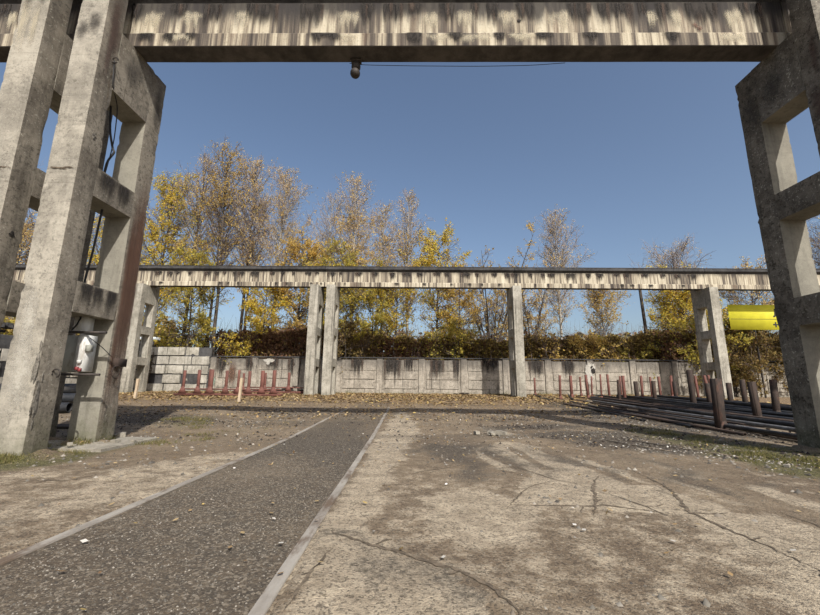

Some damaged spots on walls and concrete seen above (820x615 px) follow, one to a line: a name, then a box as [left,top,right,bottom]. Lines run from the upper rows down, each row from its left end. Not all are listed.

water stain [237,3,279,23]
water stain [300,3,324,22]
water stain [311,3,373,41]
water stain [426,3,553,40]
water stain [551,2,717,24]
rust [108,218,143,380]
water stain [246,358,278,370]
water stain [384,359,413,377]
water stain [430,360,459,376]
water stain [481,360,497,370]
water stain [529,361,543,373]
crack [499,461,820,570]